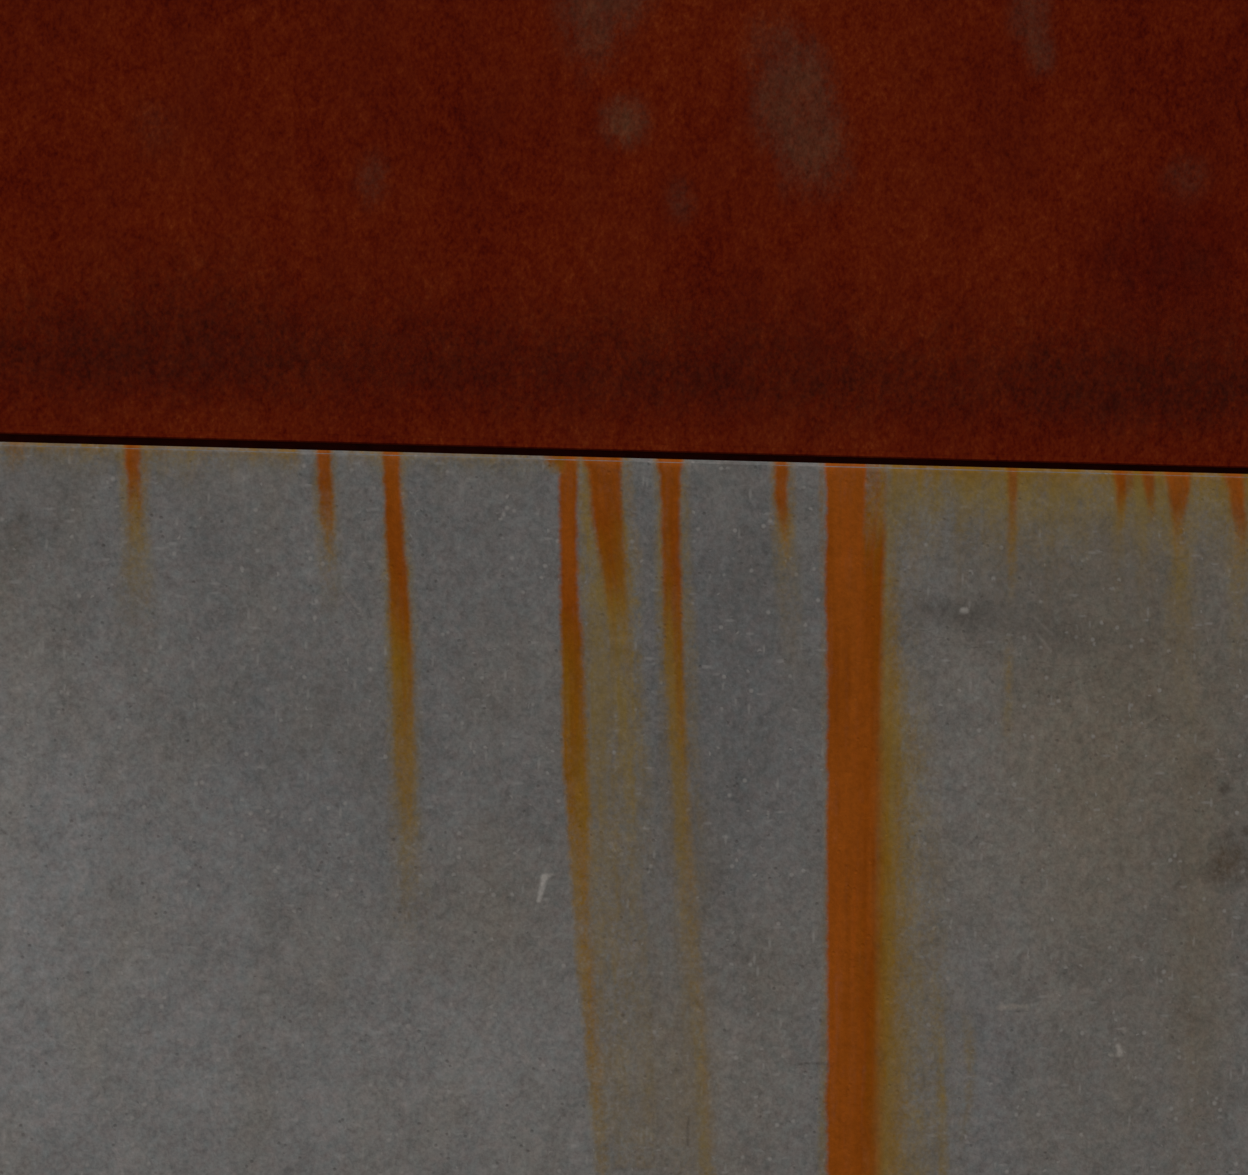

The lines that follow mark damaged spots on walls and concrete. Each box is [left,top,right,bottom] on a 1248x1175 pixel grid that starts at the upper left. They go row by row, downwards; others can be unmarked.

corrosion [0,442,730,1175]
corrosion [766,462,1248,1175]